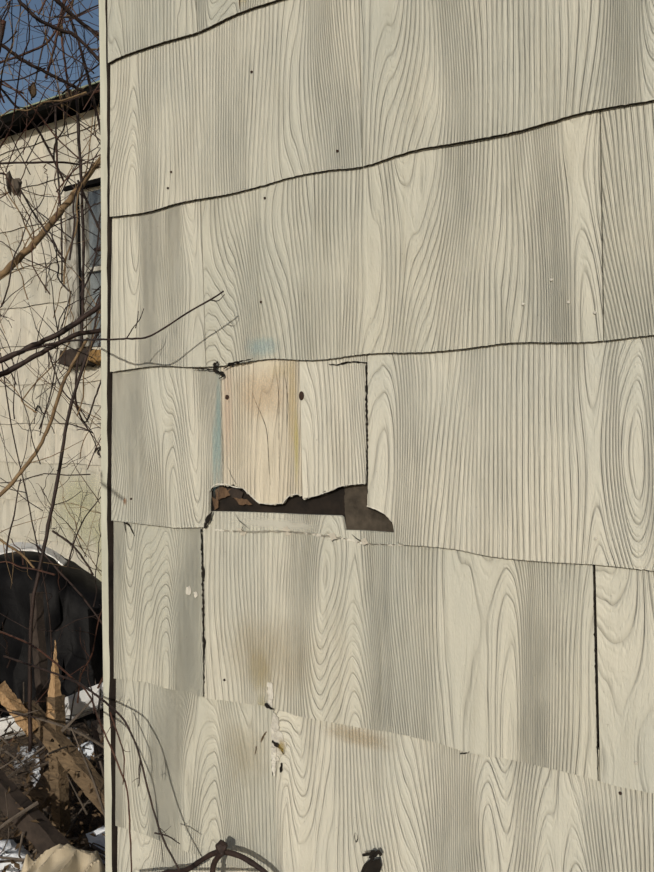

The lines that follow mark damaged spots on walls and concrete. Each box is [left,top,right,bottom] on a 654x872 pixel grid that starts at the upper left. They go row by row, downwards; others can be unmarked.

spalling [211,483,404,546]
crack [200,510,213,696]
spalling [255,682,286,777]